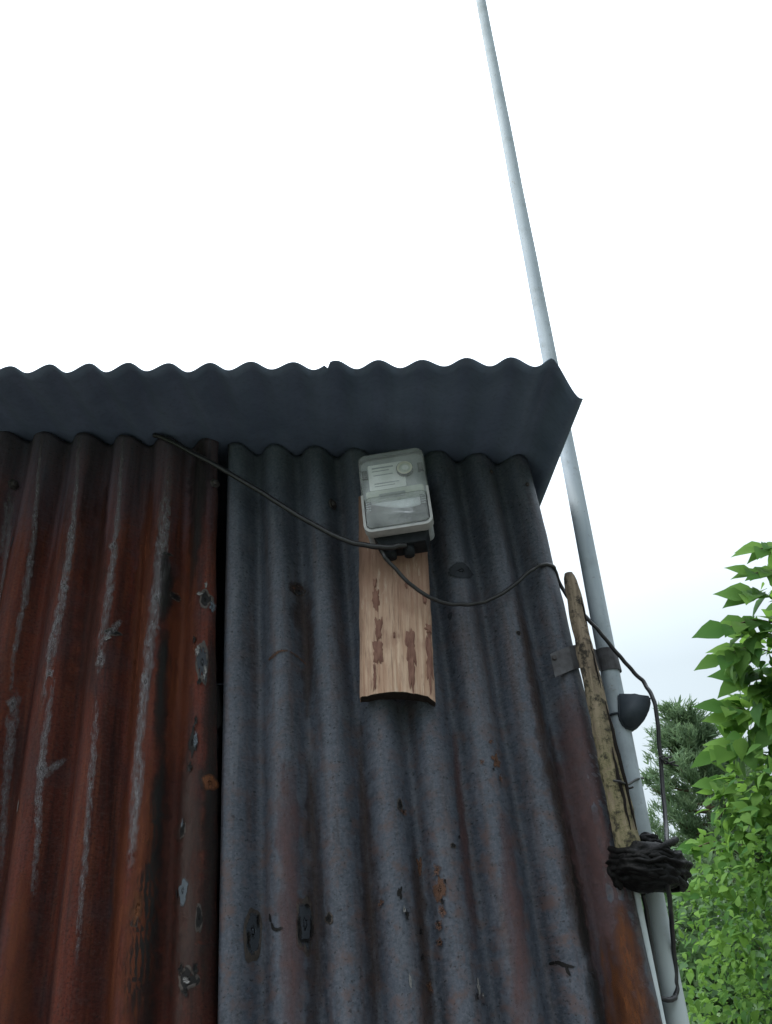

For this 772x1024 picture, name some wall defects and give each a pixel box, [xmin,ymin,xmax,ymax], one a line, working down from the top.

rust [130,508,151,727]
peeling [193,635,208,686]
rust [123,773,218,1016]
peeling [175,878,188,906]
rust [413,857,446,1024]
rust [600,910,653,1024]